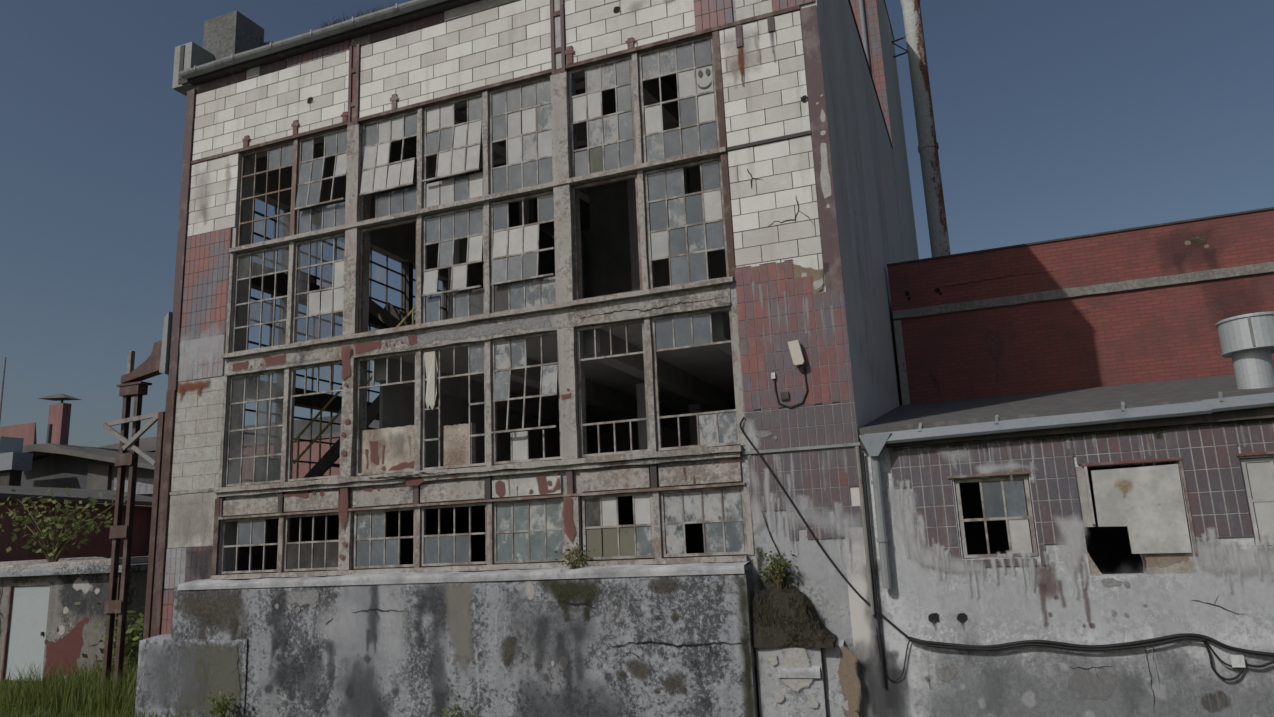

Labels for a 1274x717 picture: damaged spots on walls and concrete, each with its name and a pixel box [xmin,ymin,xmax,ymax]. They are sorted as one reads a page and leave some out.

damp [650,577,678,592]
spalling [1101,578,1130,588]
spalling [1147,553,1188,568]
damp [265,585,398,717]
damp [416,584,472,717]
damp [502,595,651,717]
damp [654,654,710,693]
damp [742,639,750,690]